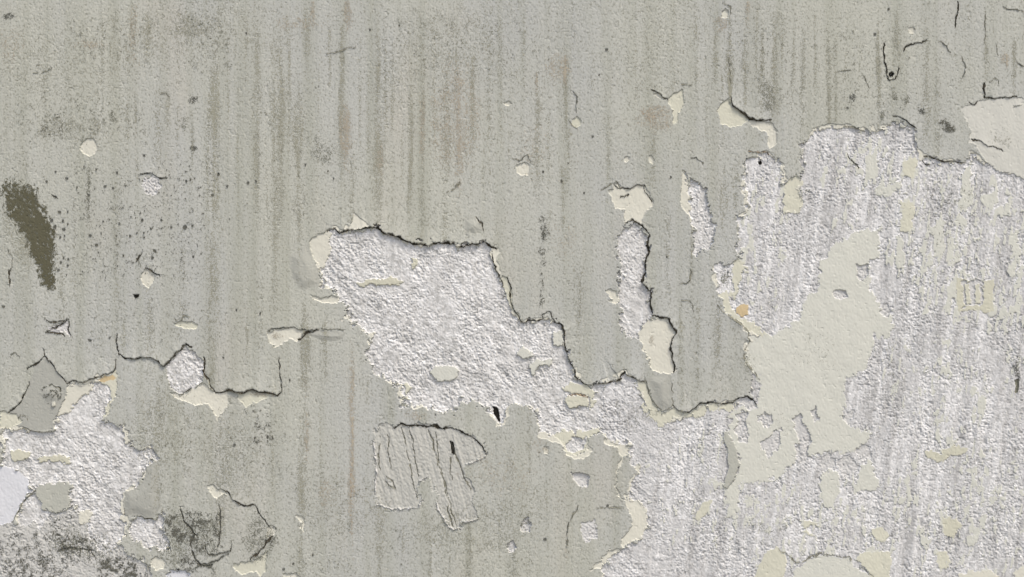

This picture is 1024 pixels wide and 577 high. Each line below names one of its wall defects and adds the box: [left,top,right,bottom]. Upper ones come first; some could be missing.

crack [837,1,1024,107]
damp [0,0,578,577]
crack [10,315,282,432]
peeling [166,347,204,394]
peeling [316,121,1024,577]
peeling [0,373,172,577]
peeling [208,484,228,499]
crack [180,491,272,569]